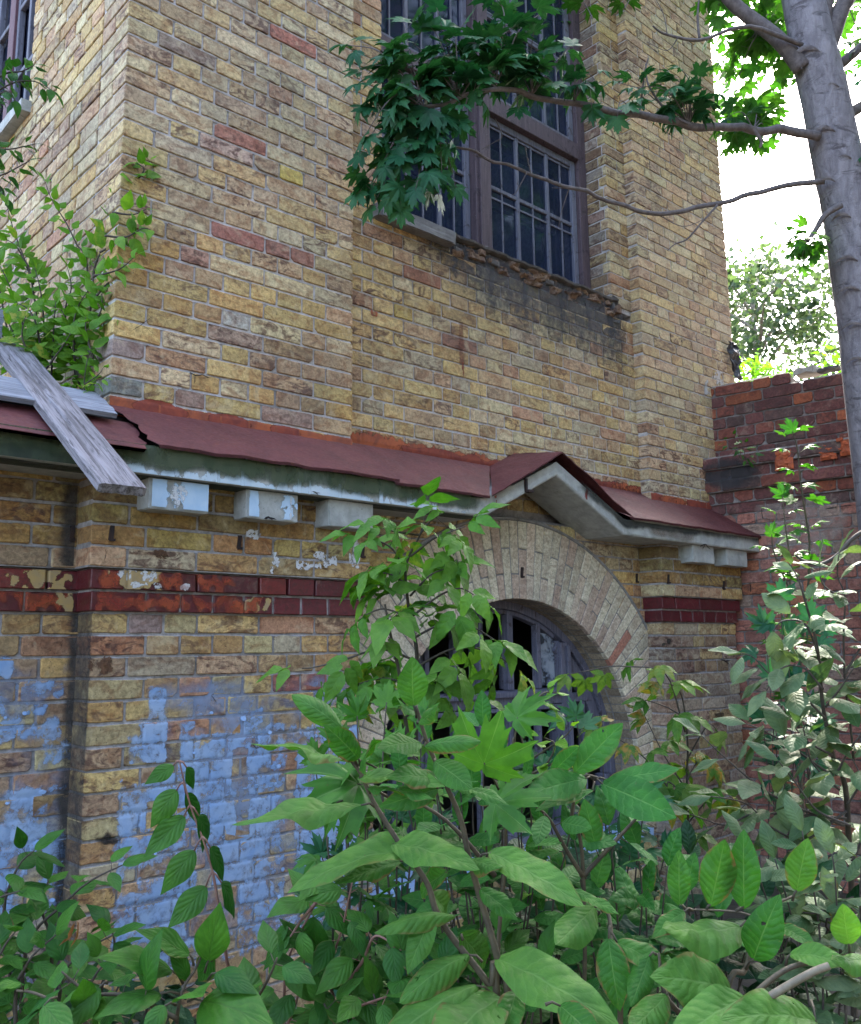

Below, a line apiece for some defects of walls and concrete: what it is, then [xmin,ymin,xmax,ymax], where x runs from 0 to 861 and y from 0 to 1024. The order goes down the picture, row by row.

damp [426,240,624,362]
spalling [774,450,794,471]
spalling [818,437,850,461]
peeling [127,463,437,520]
peeling [0,569,74,612]
peeling [95,570,271,613]
spalling [88,656,113,674]
peeling [0,657,71,764]
peeling [0,785,67,914]
peeling [110,683,358,966]